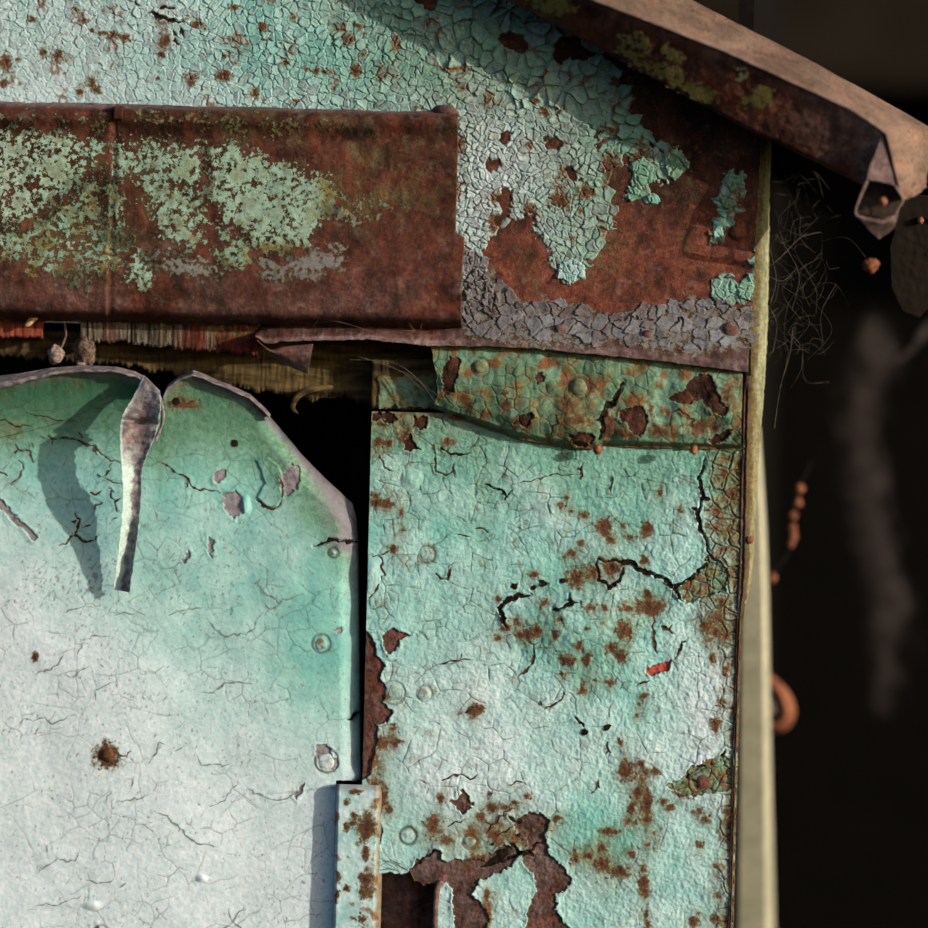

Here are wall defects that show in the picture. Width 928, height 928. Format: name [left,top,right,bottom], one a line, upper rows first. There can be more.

crack [135,1,183,23]
peeling [461,36,761,359]
crack [0,412,121,546]
peeling [222,490,244,519]
crack [595,457,710,601]
crack [497,578,580,627]
corrosion [558,589,670,695]
peeling [646,660,671,676]
corrosion [334,723,404,928]
corrosion [421,791,567,863]
corrosion [568,738,711,928]
peeling [666,755,734,797]